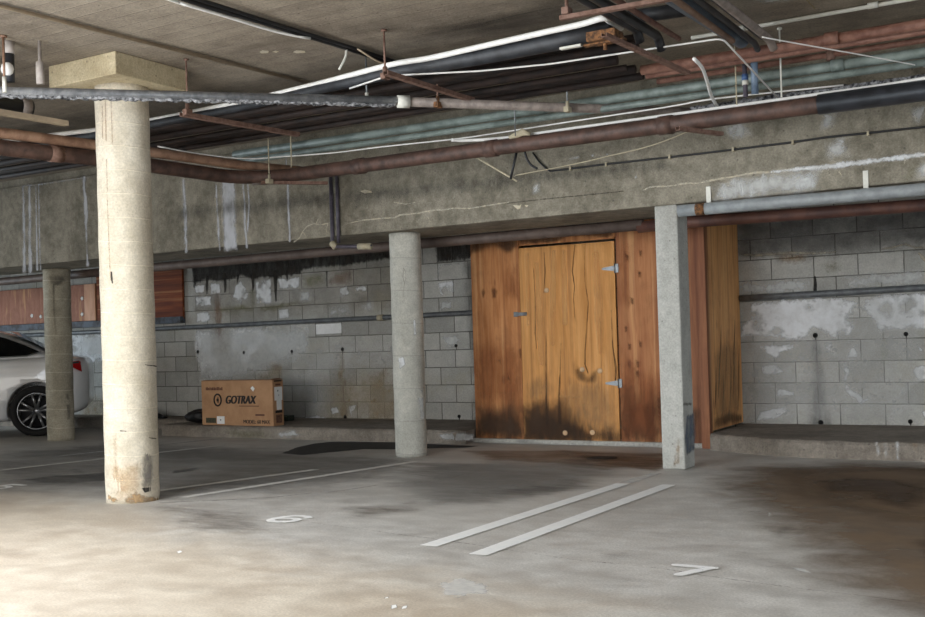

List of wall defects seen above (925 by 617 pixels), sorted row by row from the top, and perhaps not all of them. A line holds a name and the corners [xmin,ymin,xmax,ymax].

leakage [23,184,41,273]
leakage [216,183,249,250]
leakage [734,276,925,374]
leakage [478,403,590,439]
leakage [756,408,786,424]
leakage [284,442,395,455]
leakage [427,434,474,448]
leakage [484,451,663,469]
leakage [738,464,925,609]